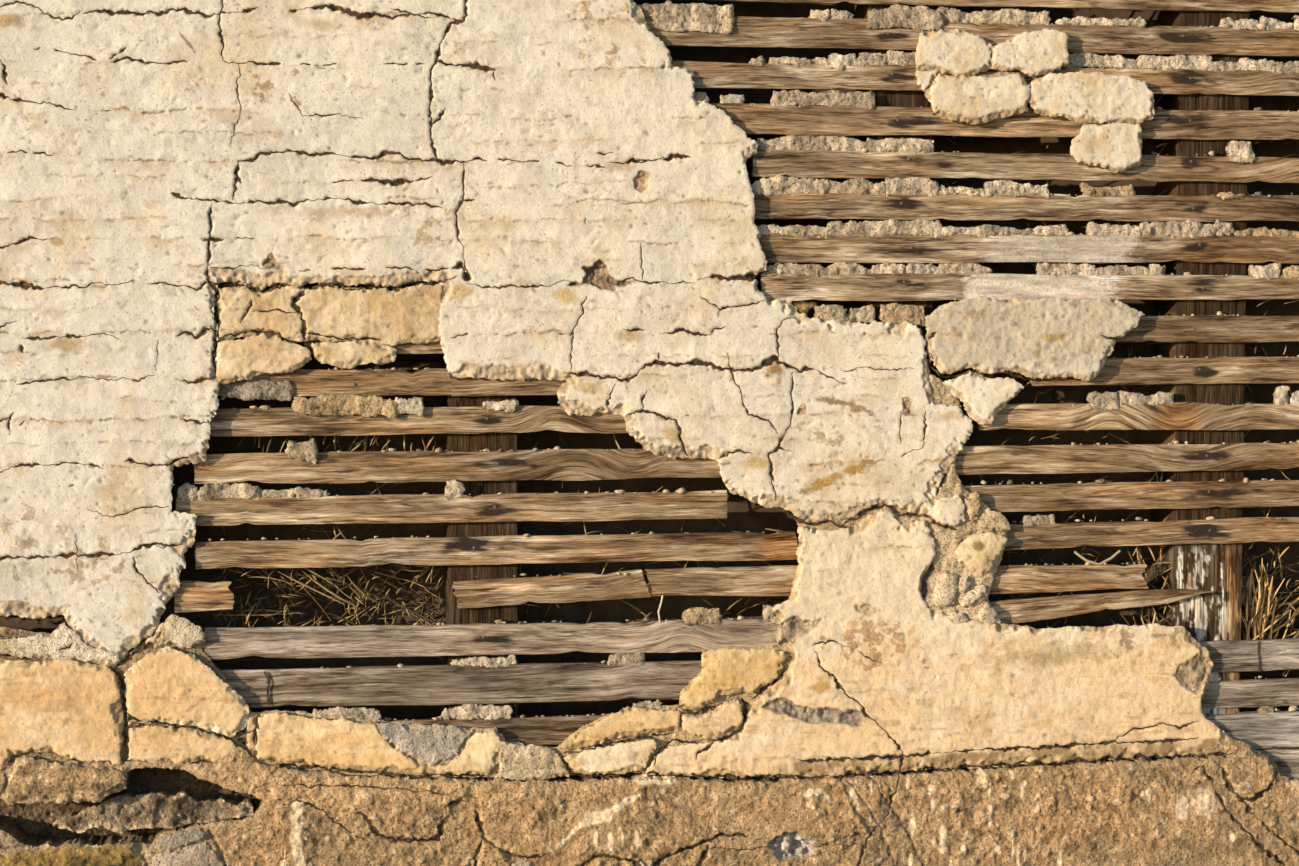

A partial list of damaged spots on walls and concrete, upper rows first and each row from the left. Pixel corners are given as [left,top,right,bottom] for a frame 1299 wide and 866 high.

crack [0,0,1043,530]
spalling [569,260,633,291]
crack [0,457,189,594]
spalling [921,564,935,600]
crack [0,616,72,660]
spalling [772,616,825,648]
peeling [841,602,905,671]
crack [114,632,271,748]
spalling [763,698,863,726]
spalling [1174,653,1210,695]
crack [559,640,1299,866]
crack [279,763,548,866]